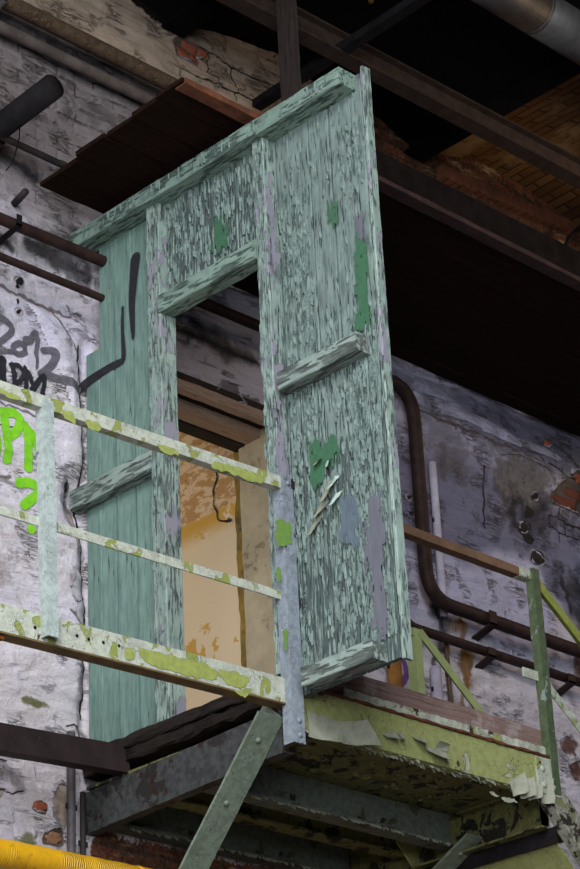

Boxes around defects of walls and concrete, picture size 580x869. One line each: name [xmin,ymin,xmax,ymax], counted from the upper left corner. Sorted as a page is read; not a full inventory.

flaking render [173,36,211,66]
crack [187,47,273,101]
peeling [293,77,325,108]
peeling [82,107,281,239]
peeling [62,410,101,431]
peeling [124,92,397,698]
flaking render [550,468,580,516]
spalling [518,491,546,568]
peeling [295,711,555,804]
spalling [32,779,67,847]
peeling [246,794,455,846]